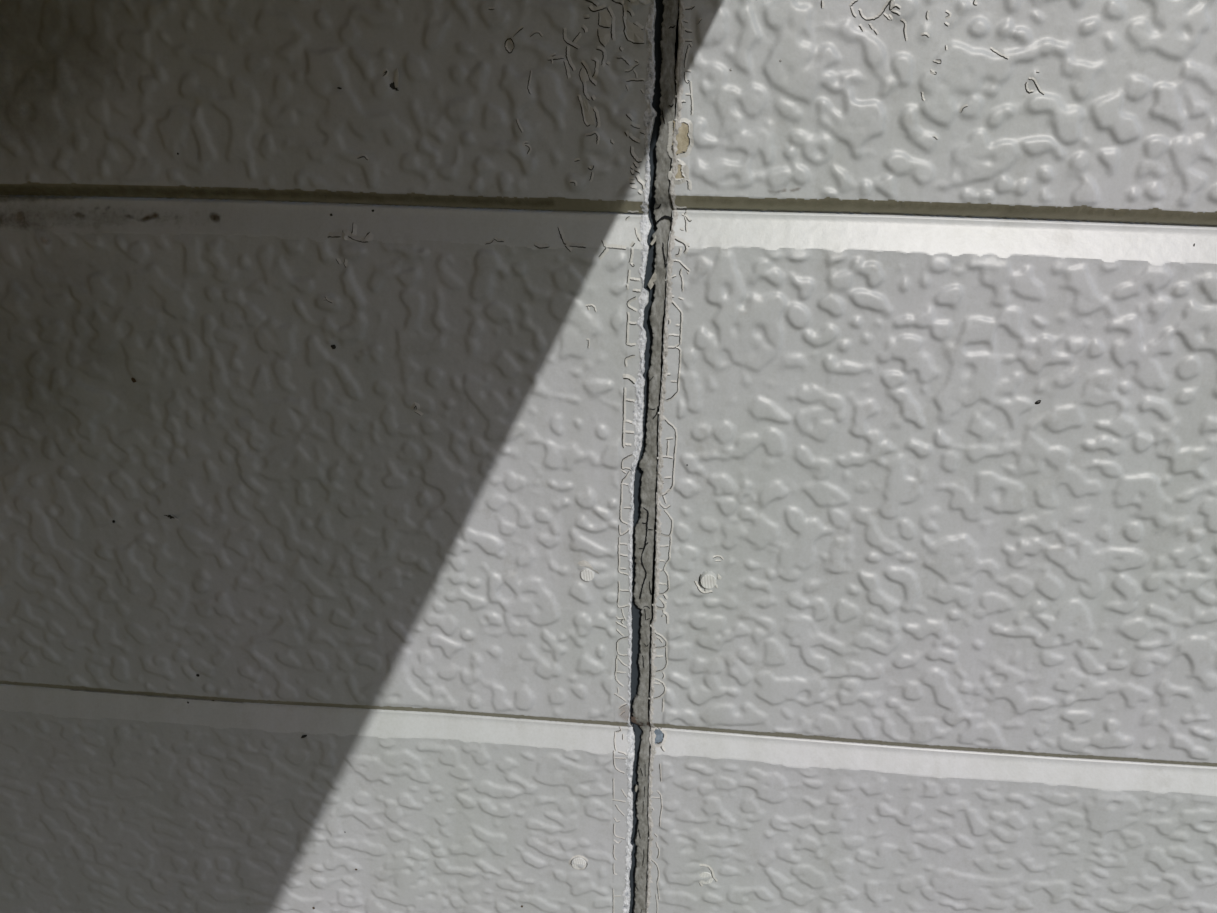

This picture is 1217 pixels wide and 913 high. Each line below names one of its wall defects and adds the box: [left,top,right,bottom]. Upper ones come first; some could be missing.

crack [504,0,724,913]
spalling [622,0,694,913]